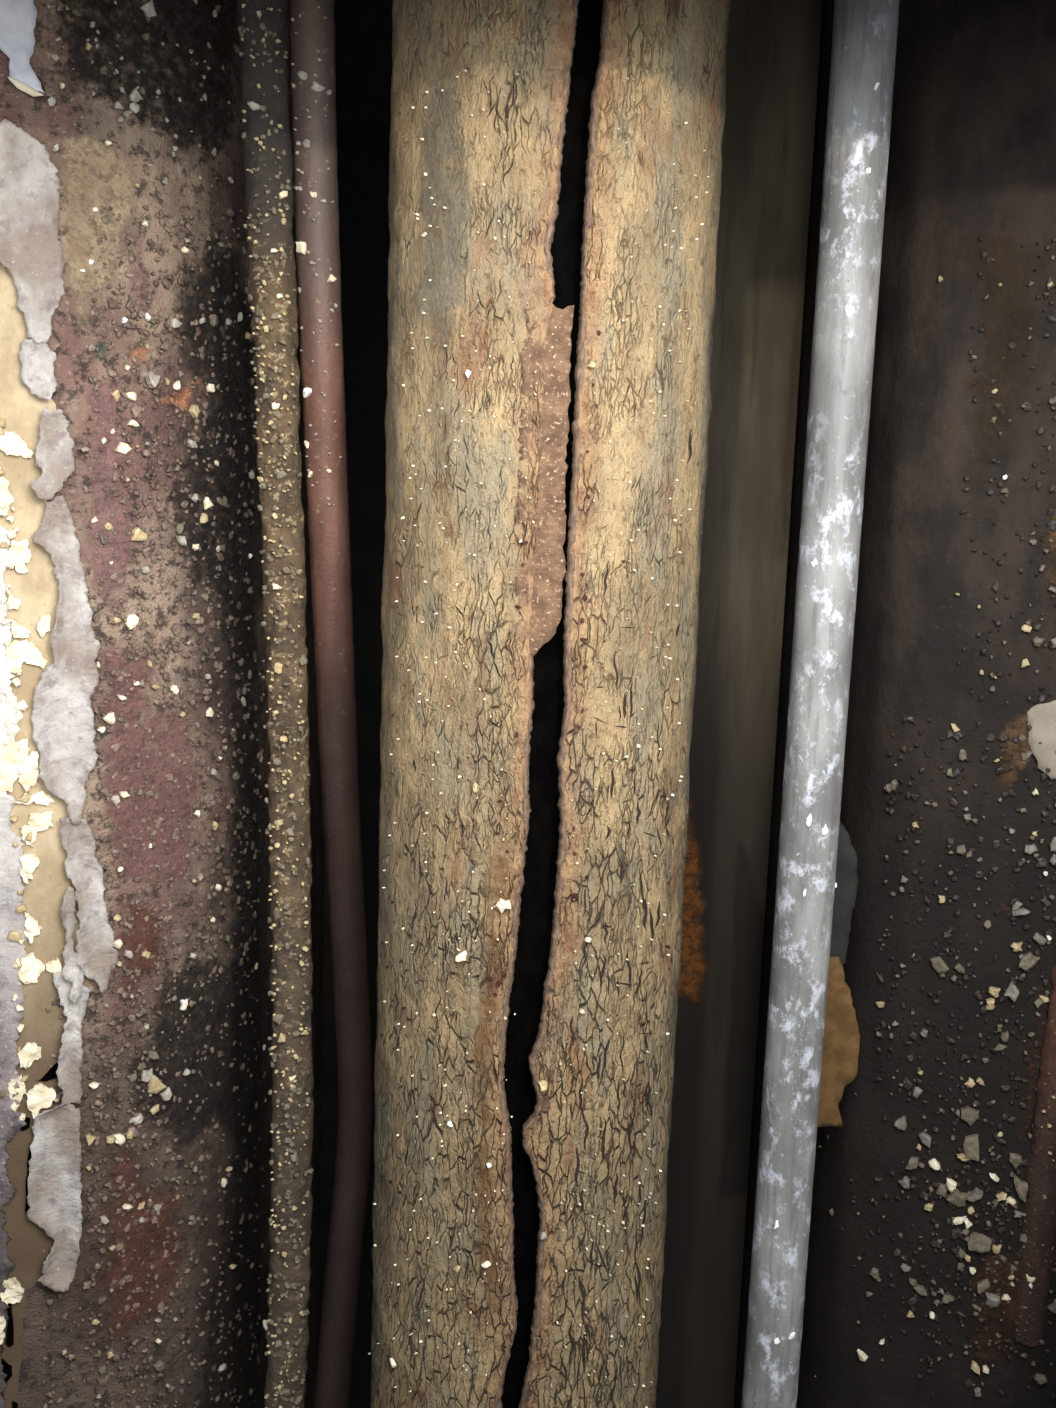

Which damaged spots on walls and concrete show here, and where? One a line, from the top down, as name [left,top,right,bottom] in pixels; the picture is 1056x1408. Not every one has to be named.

peeling [0,0,161,123]
peeling [140,0,224,101]
corrosion [162,380,199,410]
crack [685,430,693,464]
crack [412,0,680,1408]
peeling [0,117,267,1408]
crack [394,996,457,1106]